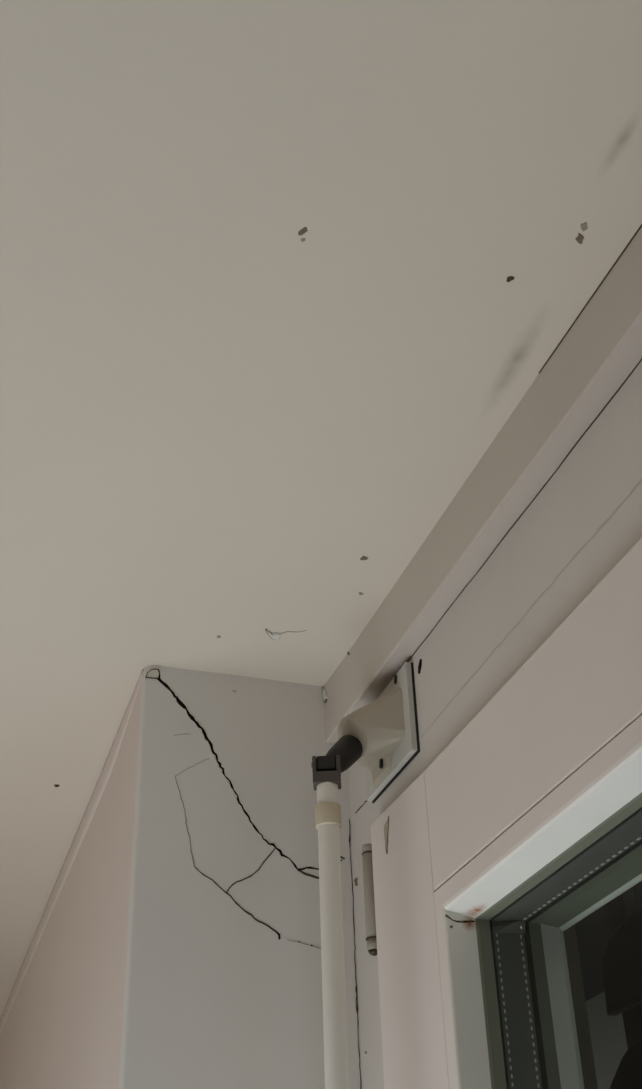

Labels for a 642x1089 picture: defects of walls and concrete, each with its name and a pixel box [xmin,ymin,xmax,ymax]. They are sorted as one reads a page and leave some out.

crack [157,673,367,1089]